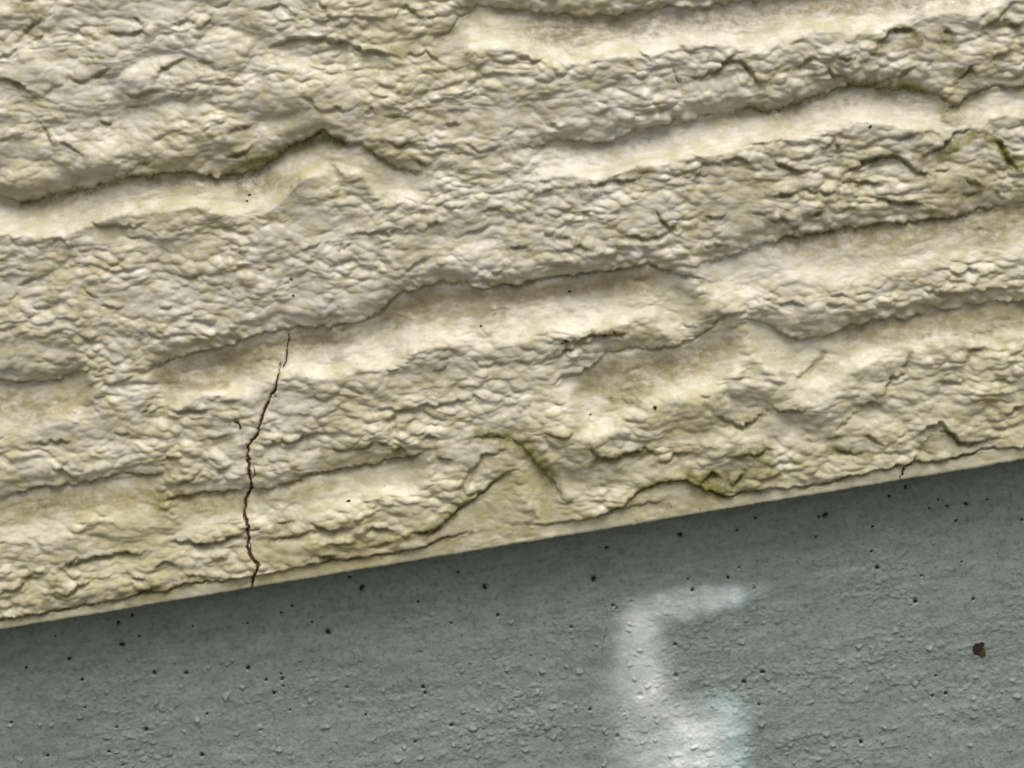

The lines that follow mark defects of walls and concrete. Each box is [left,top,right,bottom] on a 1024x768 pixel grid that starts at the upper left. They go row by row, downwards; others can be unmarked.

crack [235,334,290,588]
rust [972,642,986,658]